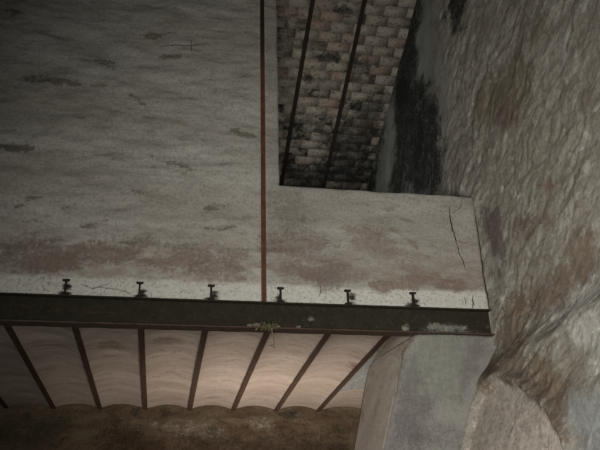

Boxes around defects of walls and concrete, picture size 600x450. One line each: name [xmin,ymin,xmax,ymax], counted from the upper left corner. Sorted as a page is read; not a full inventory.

damp [389,0,446,195]
crack [449,198,469,270]
damp [370,267,463,293]